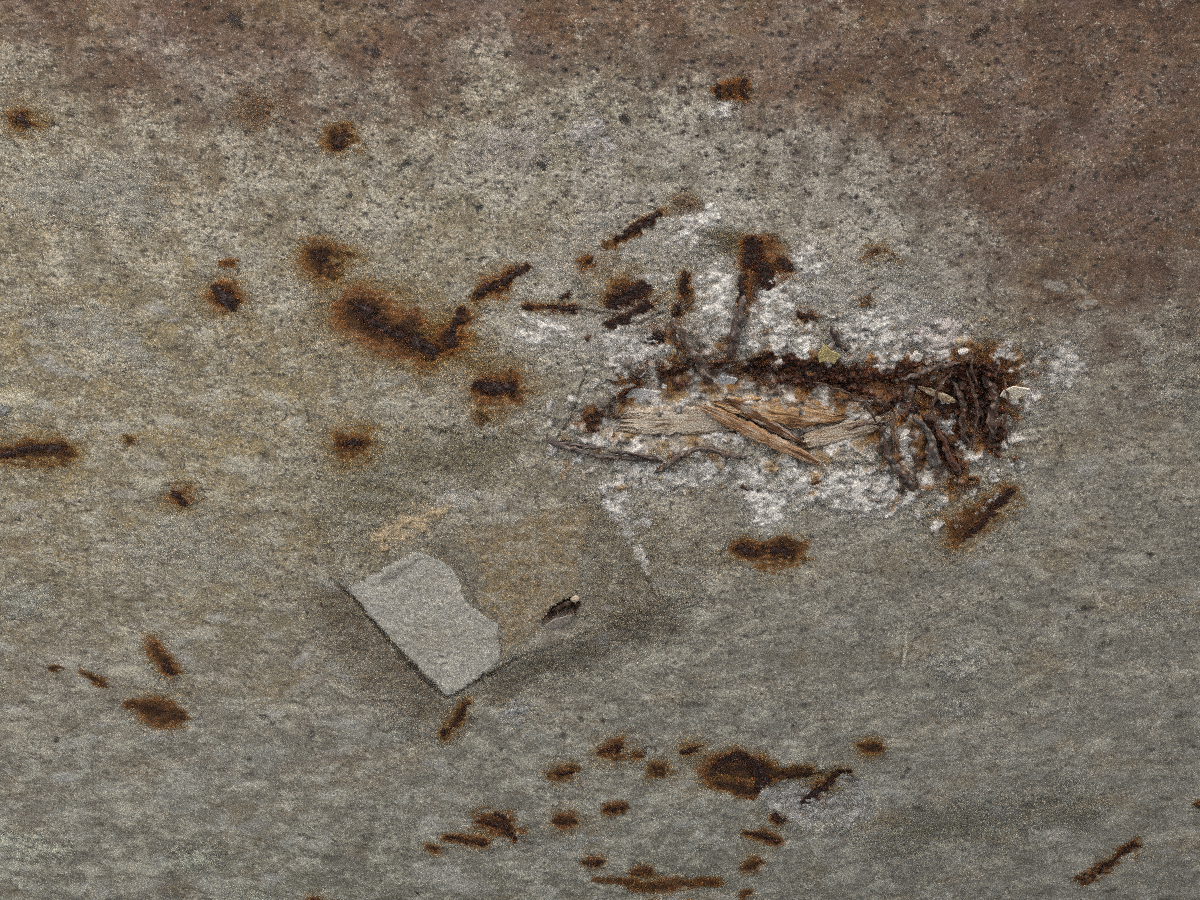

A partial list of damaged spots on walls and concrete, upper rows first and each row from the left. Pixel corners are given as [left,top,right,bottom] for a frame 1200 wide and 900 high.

rust [294,236,583,427]
water stain [512,301,689,371]
water stain [519,202,740,338]
rust [572,197,699,347]
rust [727,234,795,360]
water stain [597,453,926,575]
spalling [524,300,1053,536]
water stain [747,236,963,364]
rust [912,414,1026,550]
water stain [1023,341,1088,412]
rust [678,742,853,808]
rust [580,856,725,900]